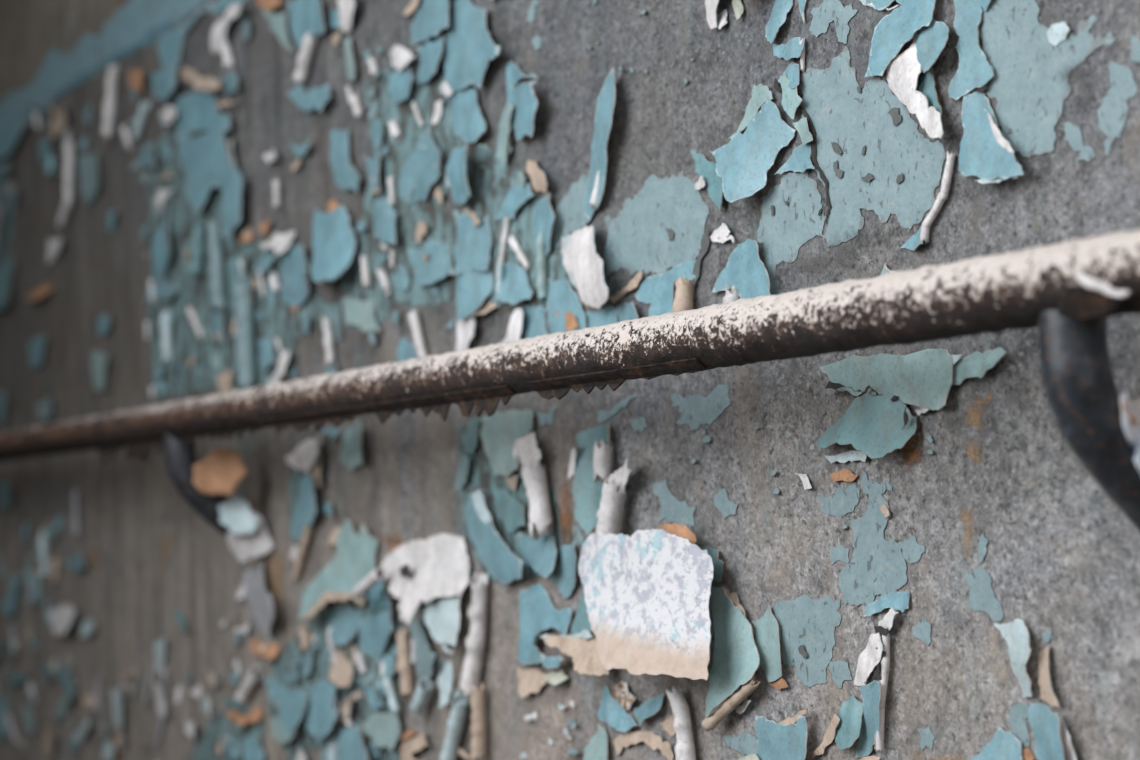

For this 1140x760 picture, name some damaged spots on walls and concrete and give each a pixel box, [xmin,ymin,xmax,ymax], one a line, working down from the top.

peeling [0,0,696,400]
peeling [691,0,815,303]
peeling [859,0,1025,251]
peeling [1047,22,1070,46]
peeling [815,348,1006,482]
peeling [0,408,910,760]
peeling [970,619,1077,760]